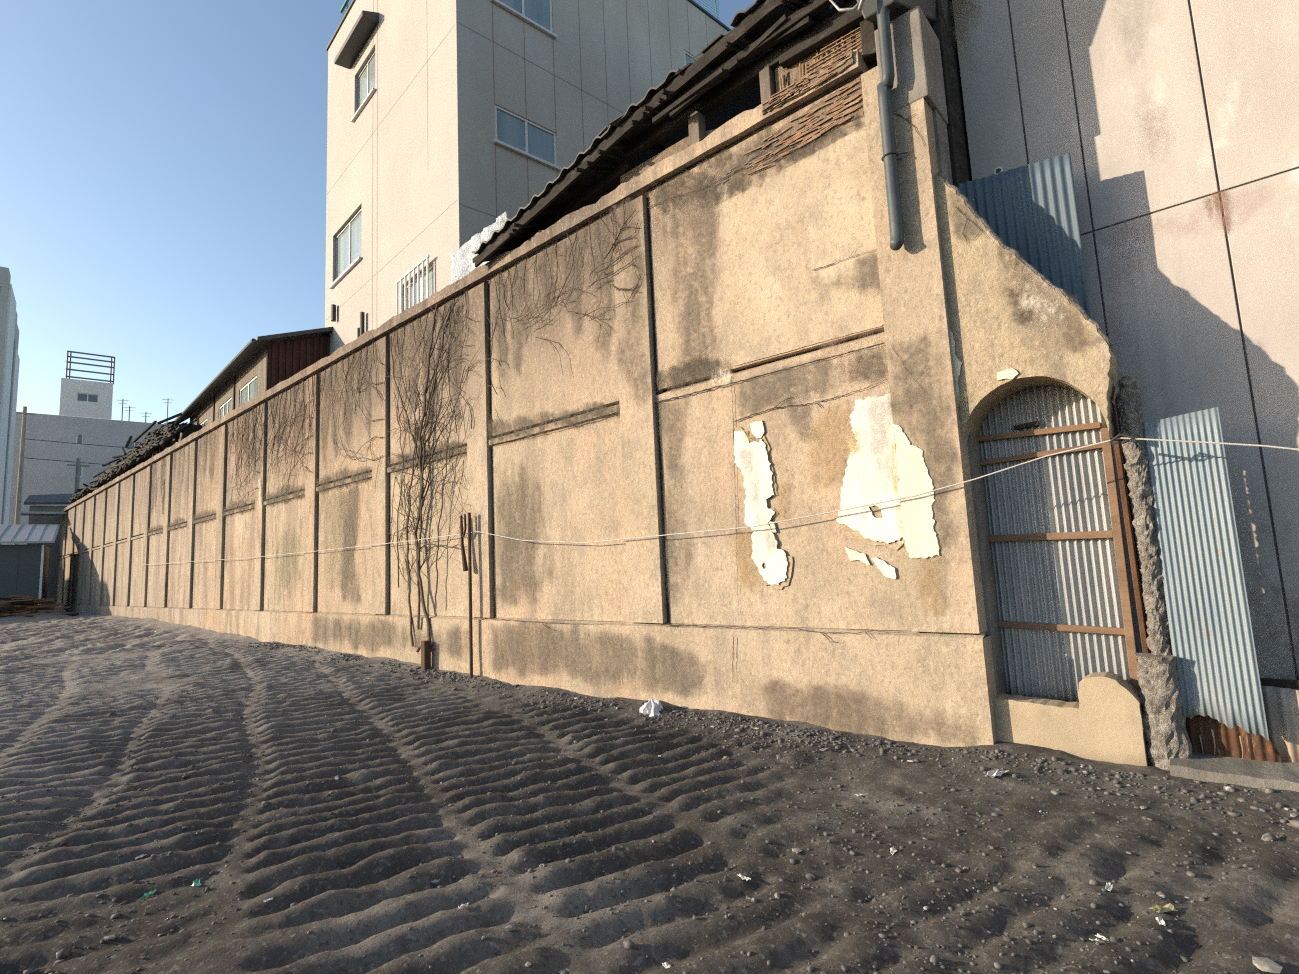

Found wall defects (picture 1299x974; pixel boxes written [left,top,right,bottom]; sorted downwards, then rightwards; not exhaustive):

damp [565,202,642,344]
damp [621,117,858,482]
damp [496,474,539,603]
damp [487,402,620,444]
peeling [730,420,793,590]
peeling [834,393,940,579]
damp [492,623,701,694]
rust [1185,715,1282,763]